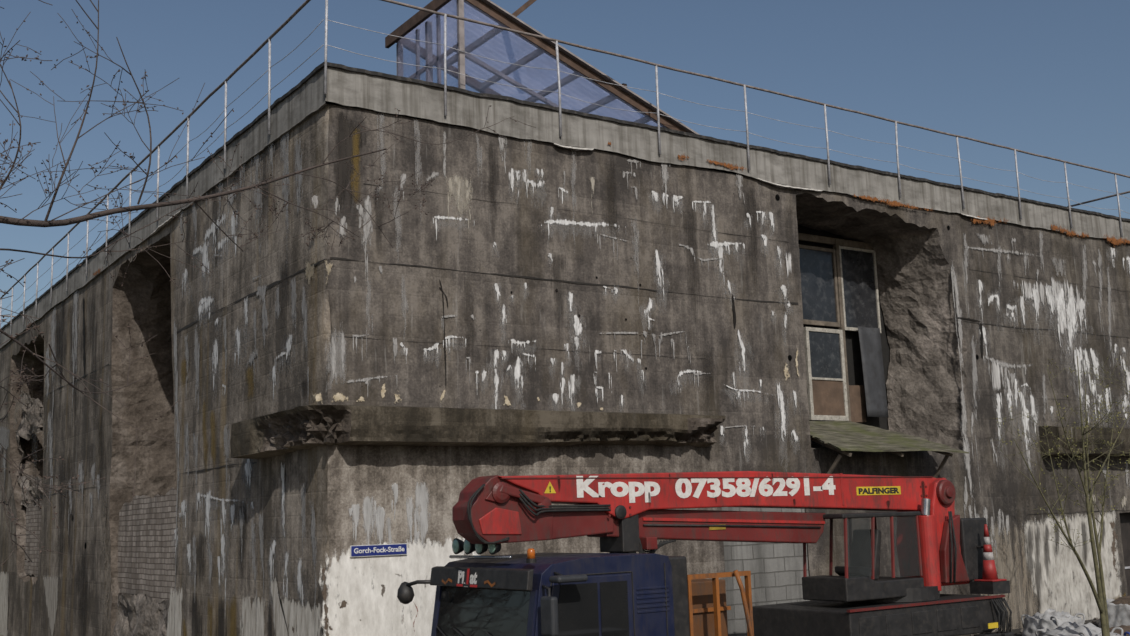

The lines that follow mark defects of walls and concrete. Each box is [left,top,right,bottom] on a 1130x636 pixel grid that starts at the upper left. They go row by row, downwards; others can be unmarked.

damp [498,135,545,197]
damp [541,171,626,260]
damp [623,159,641,199]
damp [652,163,745,293]
damp [747,211,791,327]
damp [951,232,1130,632]